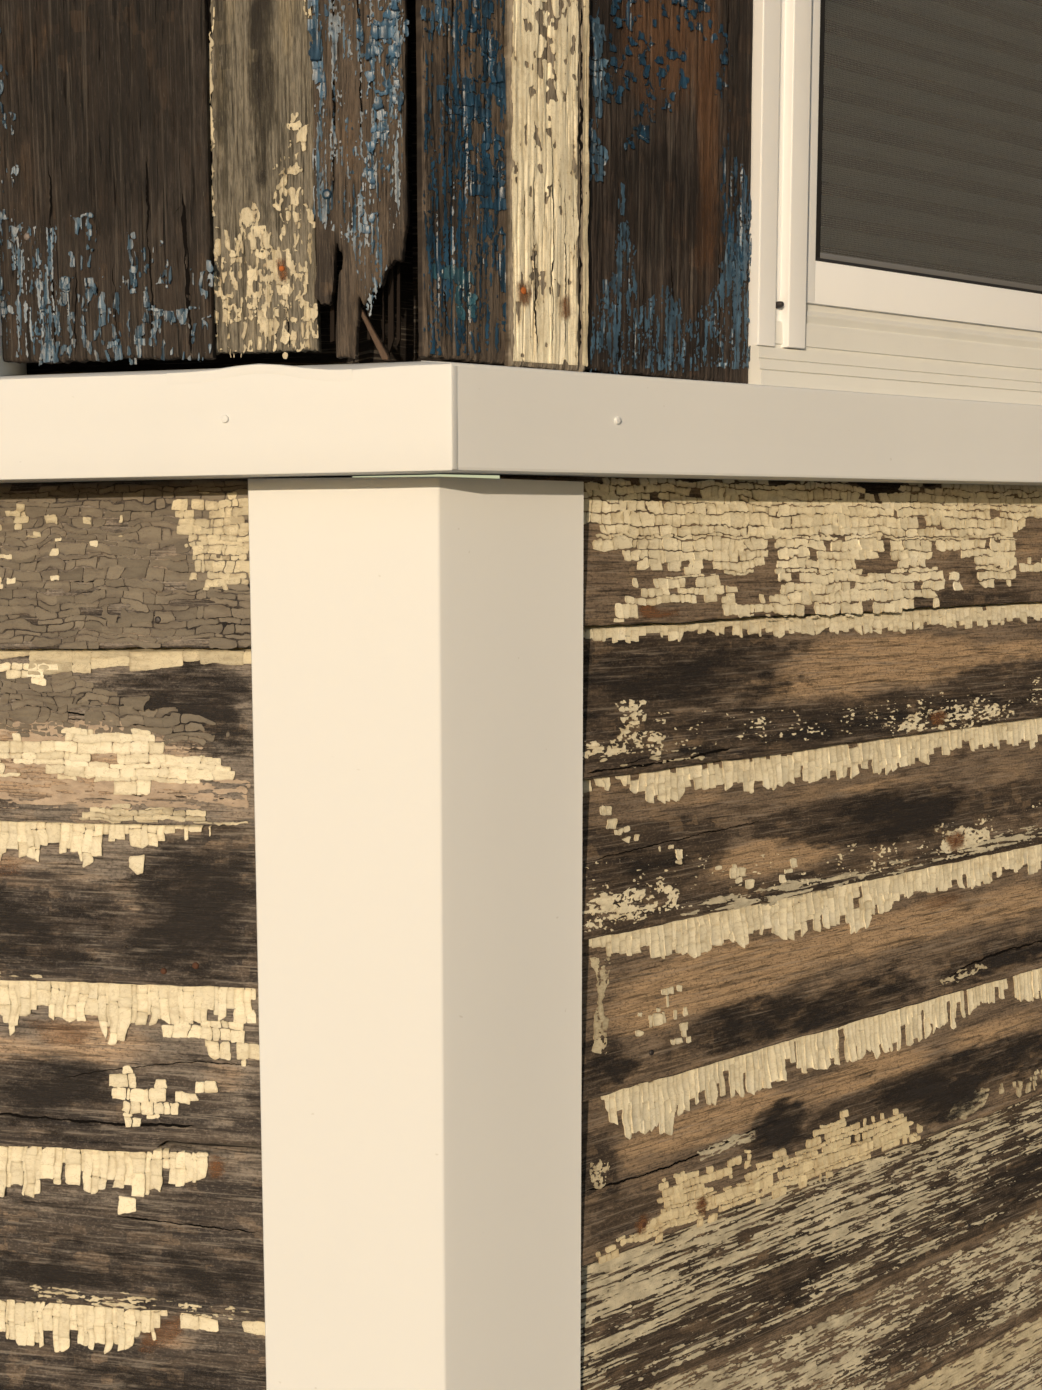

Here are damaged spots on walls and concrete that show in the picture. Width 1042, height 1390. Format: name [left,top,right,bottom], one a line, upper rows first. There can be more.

peeling [0,0,752,375]
rust [518,283,532,305]
peeling [583,477,1042,643]
peeling [0,478,252,875]
peeling [583,677,1042,843]
peeling [582,803,1042,1054]
peeling [0,971,260,1066]
peeling [601,964,1042,1139]
peeling [0,1146,209,1215]
peeling [580,1069,1042,1390]
peeling [0,1284,265,1354]